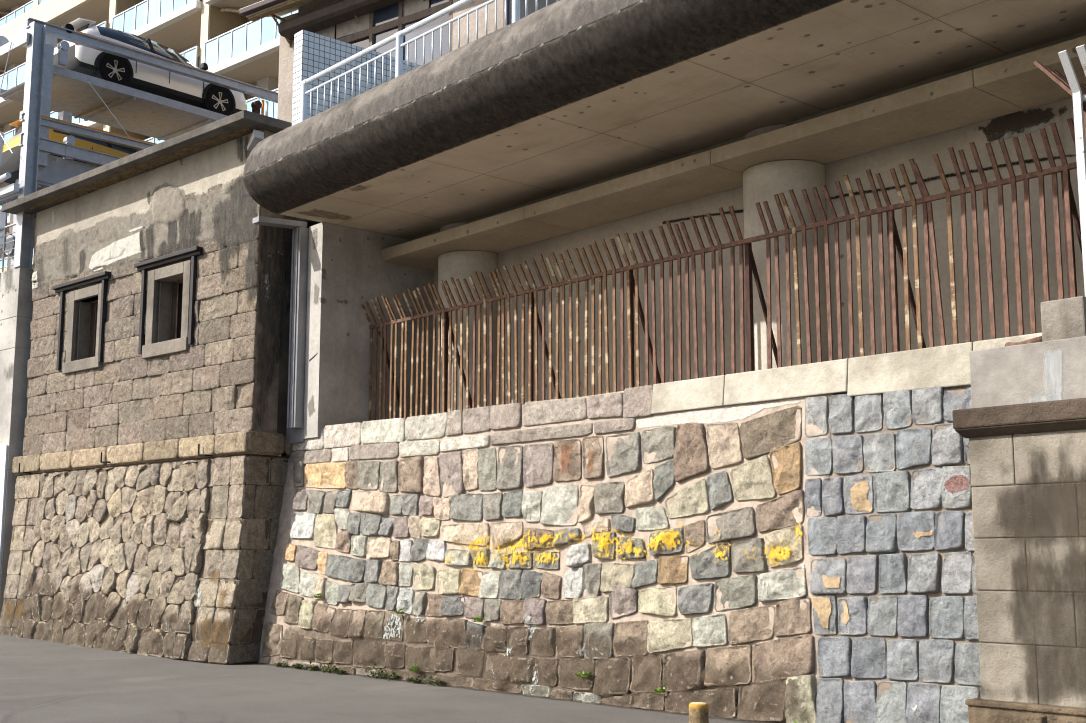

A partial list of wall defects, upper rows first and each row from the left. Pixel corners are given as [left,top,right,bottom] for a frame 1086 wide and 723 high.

peeling [24,128,252,289]
damp [139,209,201,259]
damp [237,136,250,161]
damp [214,175,293,427]
damp [999,455,1086,700]